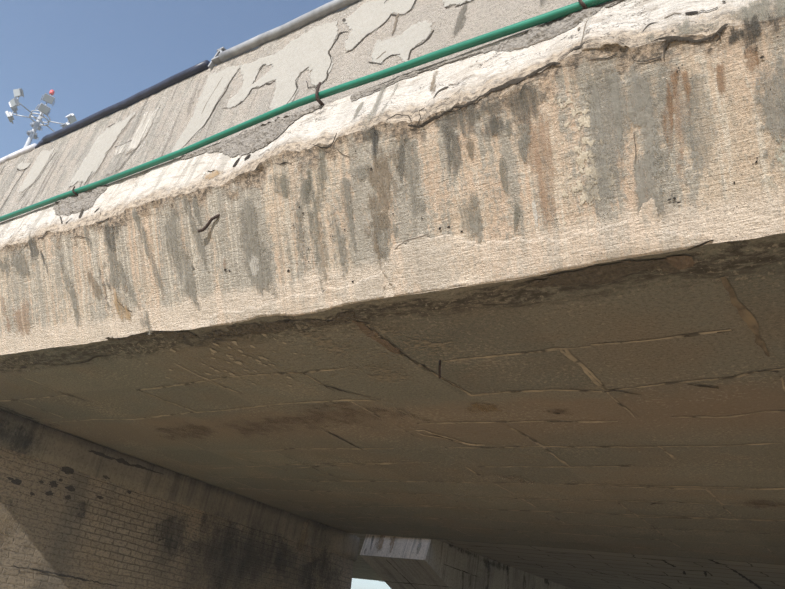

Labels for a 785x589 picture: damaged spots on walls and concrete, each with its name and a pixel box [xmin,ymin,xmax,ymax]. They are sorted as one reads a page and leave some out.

peeling [53,108,158,223]
peeling [171,0,434,167]
water stain [351,85,385,163]
spalling [350,0,622,101]
water stain [435,83,550,174]
water stain [0,232,46,277]
water stain [104,221,150,335]
water stain [274,149,357,285]
peeling [105,90,714,360]
crack [89,450,164,475]
crack [14,565,119,586]
crack [592,558,762,589]